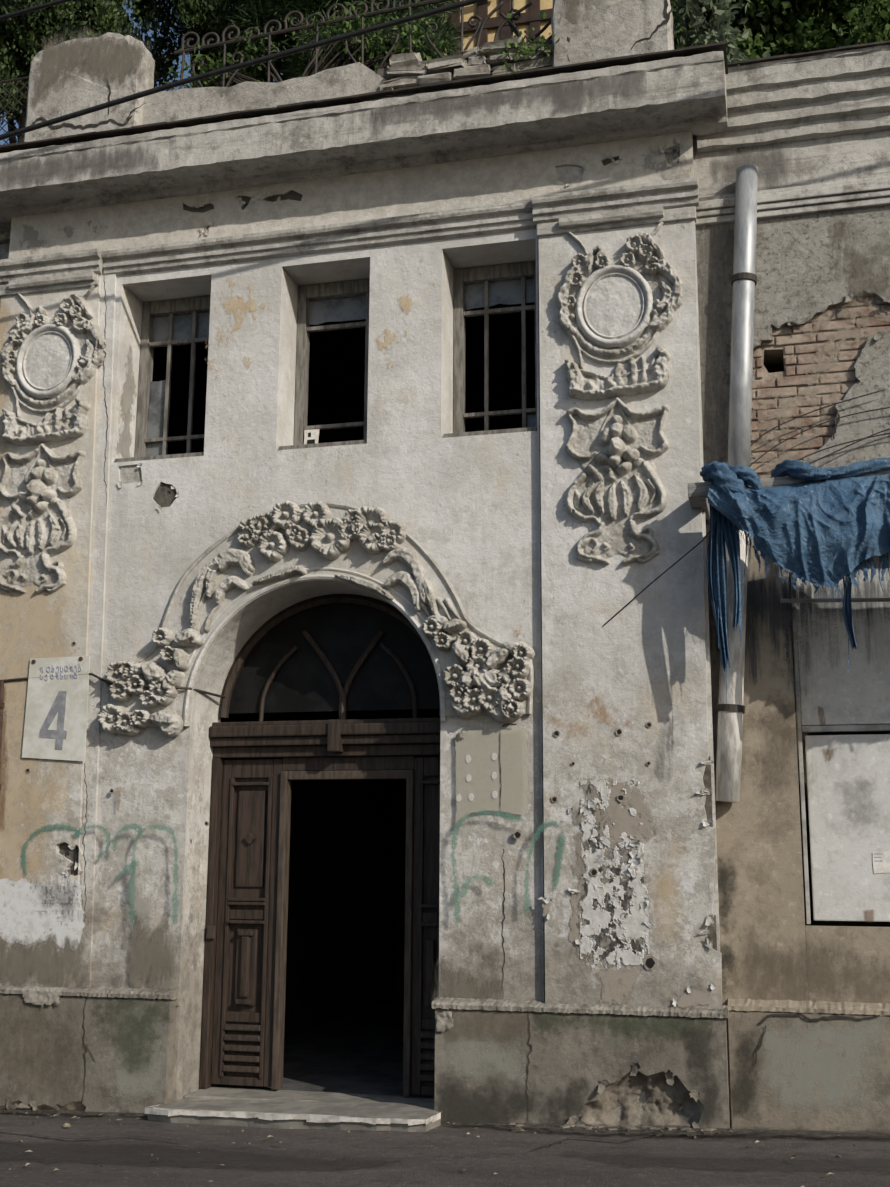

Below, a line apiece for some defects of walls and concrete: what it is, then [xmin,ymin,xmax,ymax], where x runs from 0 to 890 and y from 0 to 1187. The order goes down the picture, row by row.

crack [631,0,673,49]
crack [32,80,146,129]
flaking render [750,291,890,478]
flaking render [153,482,180,512]
leakage [745,573,808,696]
leakage [0,579,66,886]
flaking render [59,842,79,878]
crack [499,849,507,994]
peeling [568,776,659,970]
crack [524,1012,532,1119]
spalling [566,1062,703,1128]
crack [752,1014,880,1071]